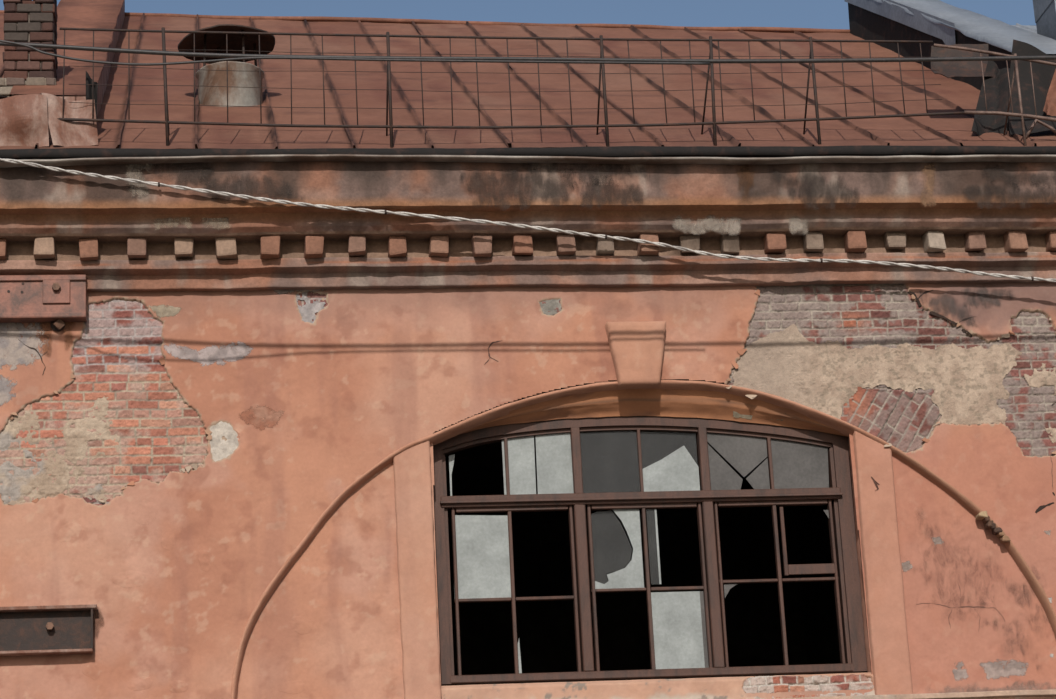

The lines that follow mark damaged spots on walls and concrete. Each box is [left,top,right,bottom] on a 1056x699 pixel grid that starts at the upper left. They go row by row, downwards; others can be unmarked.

spalling [275,289,328,324]
spalling [539,299,562,316]
crack [908,290,972,337]
spalling [726,284,1056,457]
spalling [0,299,283,505]
crack [1035,460,1055,513]
spalling [742,673,874,699]